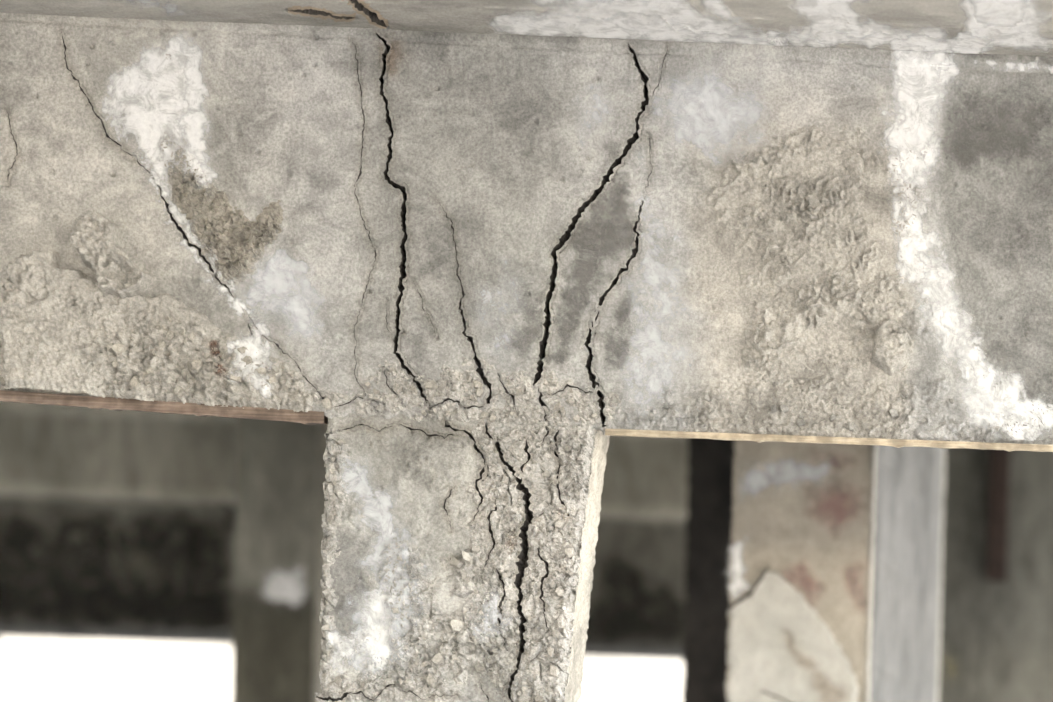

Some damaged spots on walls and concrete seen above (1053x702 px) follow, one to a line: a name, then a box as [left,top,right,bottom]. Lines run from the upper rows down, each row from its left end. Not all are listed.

crack [5,110,20,186]
leakage [102,37,323,397]
spalling [263,568,306,605]
crack [60,0,670,702]
spalling [311,352,1053,702]
leakage [491,0,1053,441]